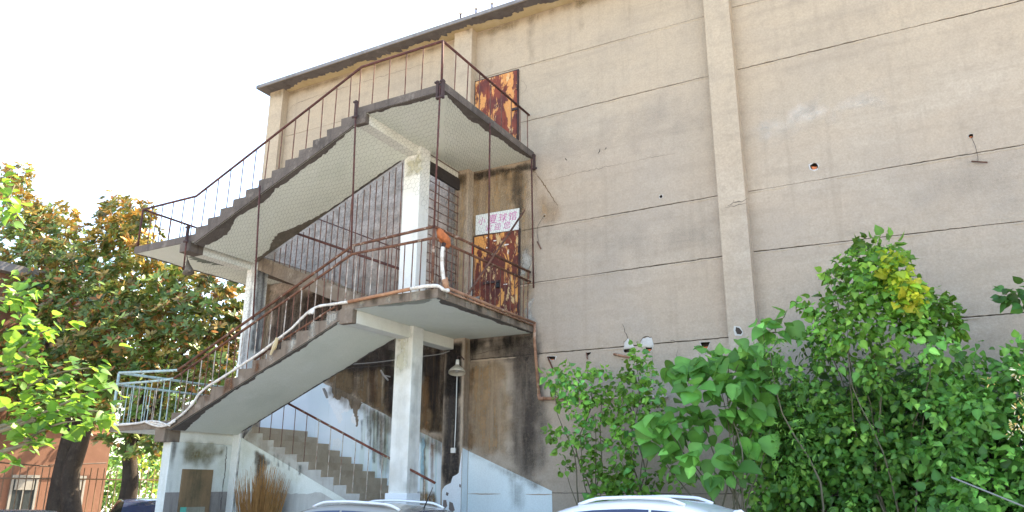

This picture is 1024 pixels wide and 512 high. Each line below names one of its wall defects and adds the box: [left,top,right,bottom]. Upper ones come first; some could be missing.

water stain [275,157,532,322]
water stain [241,270,342,369]
water stain [328,338,403,449]
water stain [420,336,544,485]